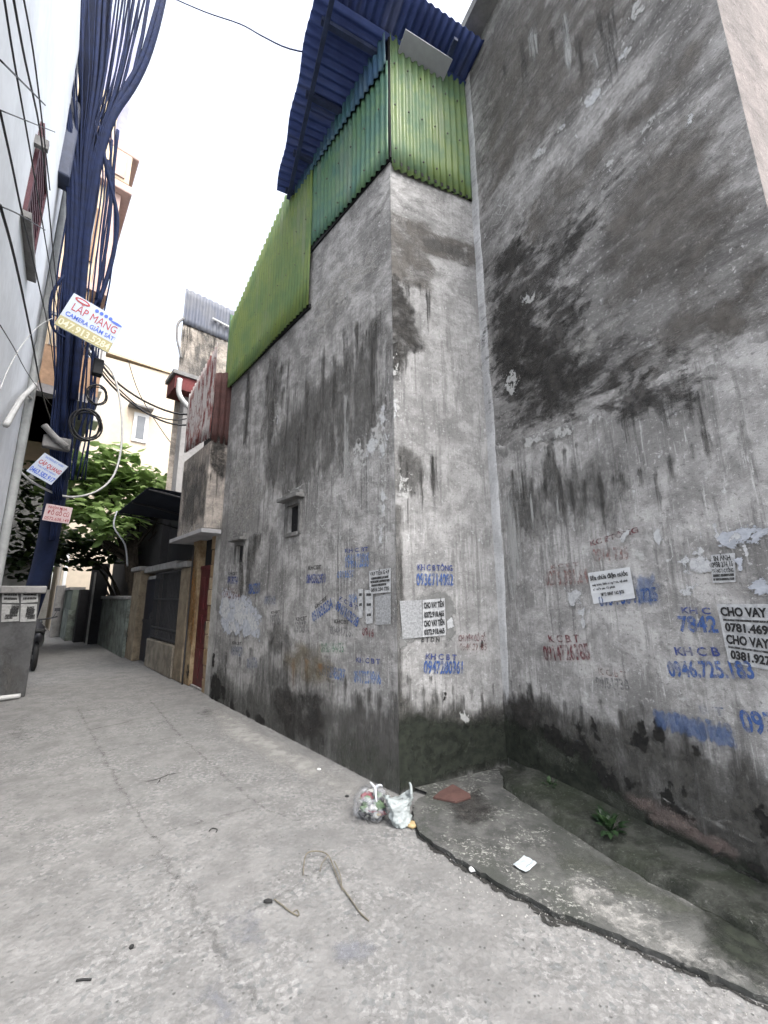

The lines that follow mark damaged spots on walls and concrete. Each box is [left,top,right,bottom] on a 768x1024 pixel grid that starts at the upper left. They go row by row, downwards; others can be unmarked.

damp [215,0,768,866]
peeling [712,523,768,571]
peeling [748,578,768,595]
crack [412,807,768,1011]